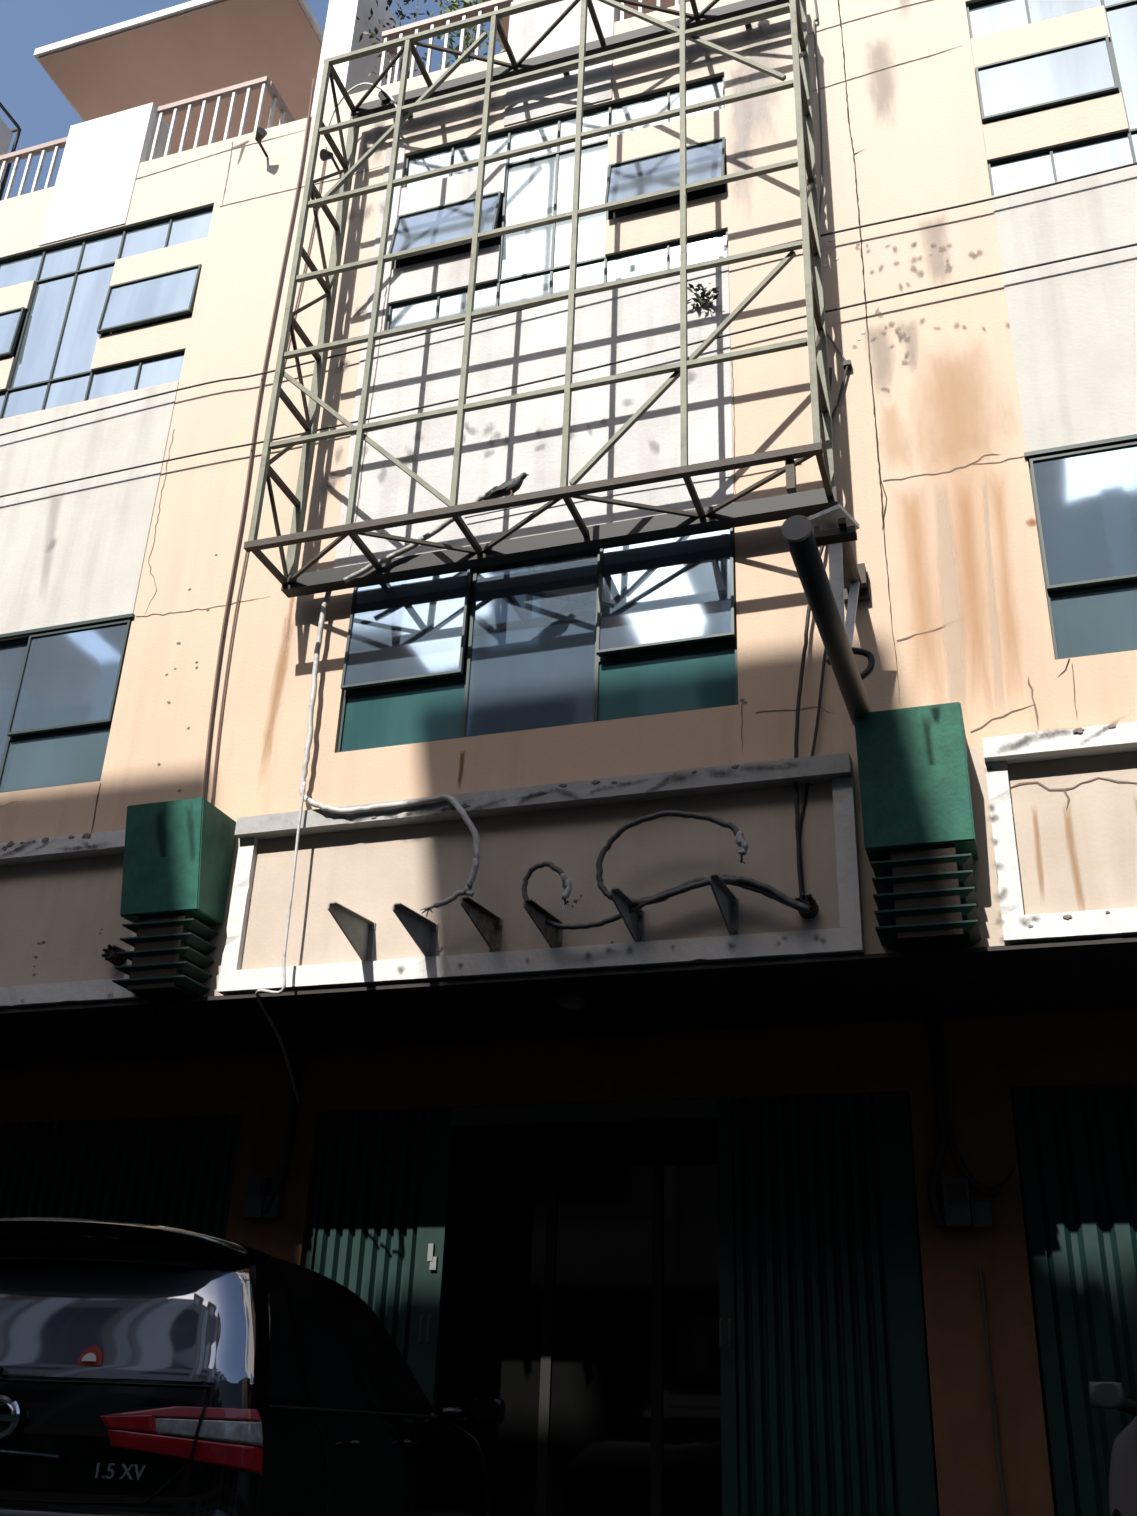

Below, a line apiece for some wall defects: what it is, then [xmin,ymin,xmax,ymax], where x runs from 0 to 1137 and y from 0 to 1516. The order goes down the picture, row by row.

crack [838,0,1024,699]
crack [970,659,1077,733]
crack [1009,777,1137,810]
rust [1066,819,1081,894]